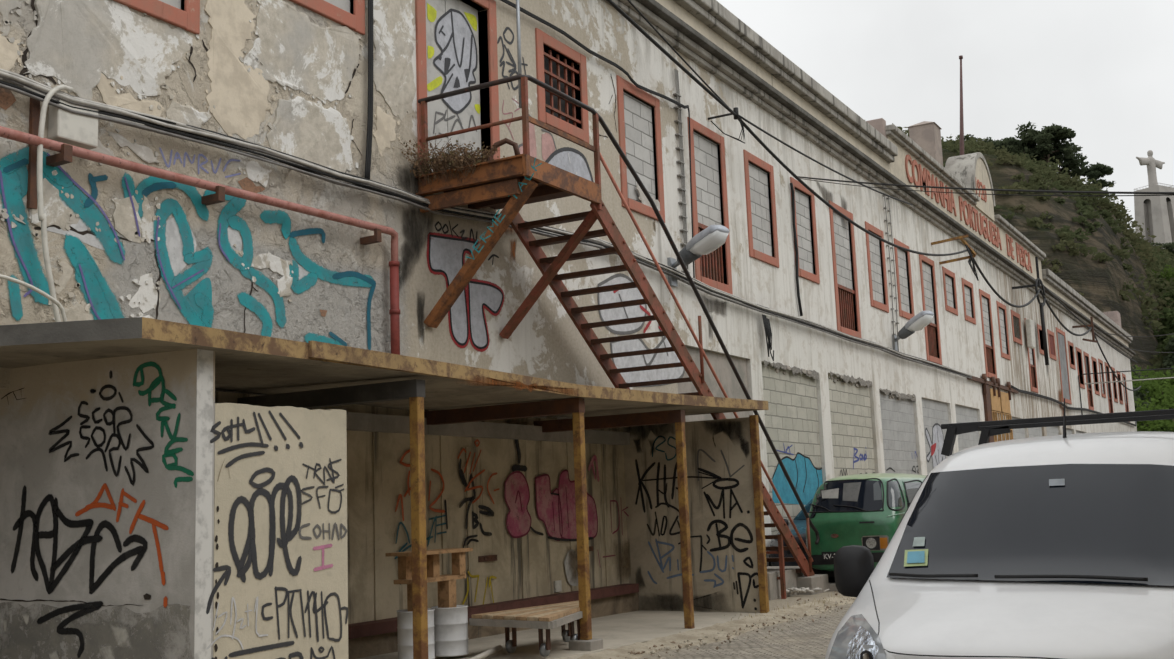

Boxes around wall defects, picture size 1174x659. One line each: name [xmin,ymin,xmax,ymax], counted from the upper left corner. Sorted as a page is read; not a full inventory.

crack [188,40,208,82]
flaking render [0,0,416,193]
flaking render [0,170,161,245]